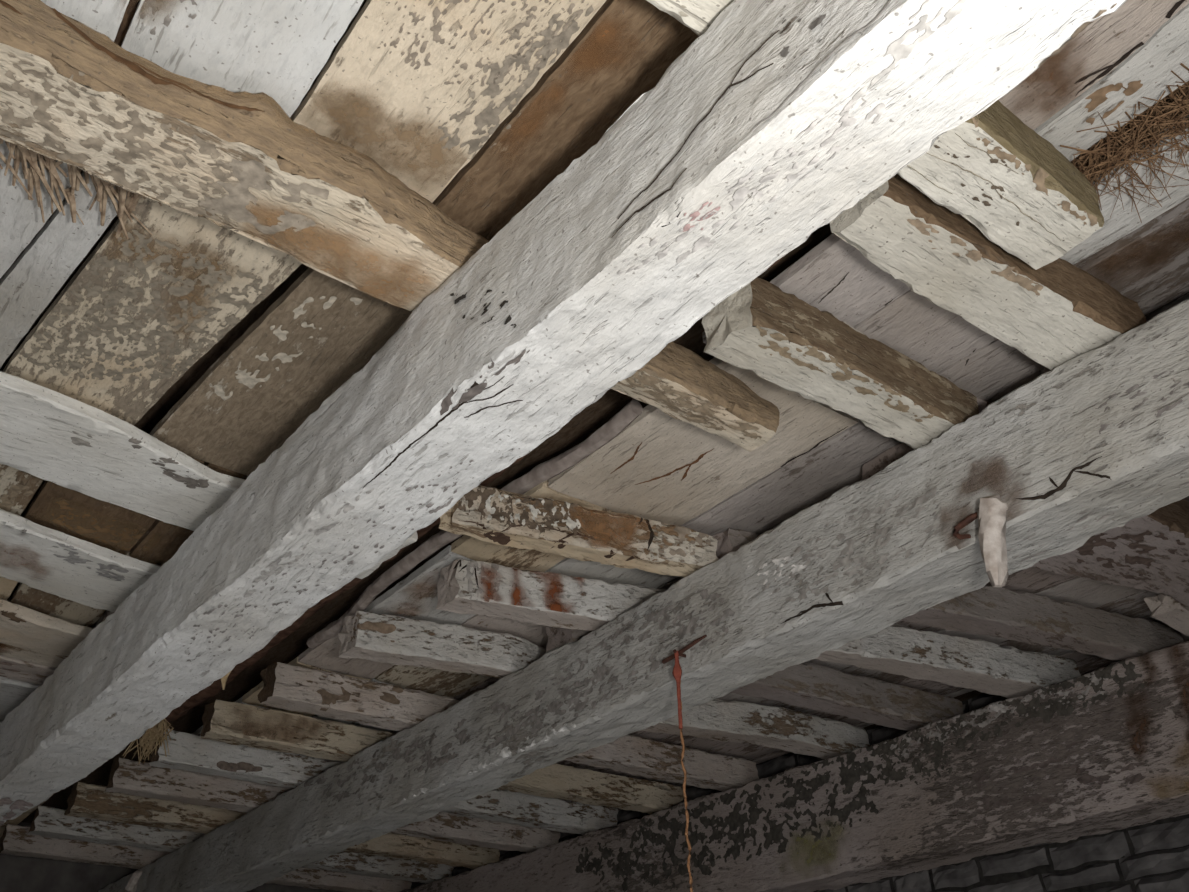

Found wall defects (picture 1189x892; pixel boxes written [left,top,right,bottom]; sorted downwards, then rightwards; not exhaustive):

peeling [0,53,329,234]
damp [303,93,466,182]
peeling [378,0,594,154]
crack [611,22,791,238]
crack [751,0,891,131]
crack [363,376,523,488]
crack [1016,456,1110,500]
peeling [187,460,585,662]
rust [482,570,523,606]
rust [535,571,569,613]
crack [781,593,843,624]
peeling [883,671,1109,757]